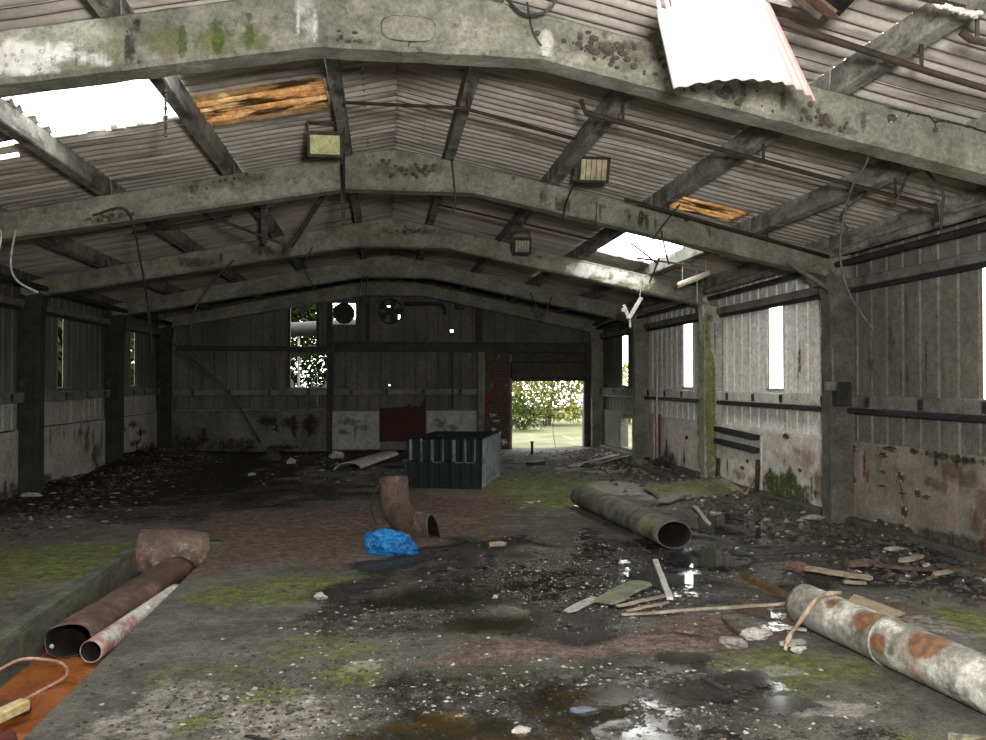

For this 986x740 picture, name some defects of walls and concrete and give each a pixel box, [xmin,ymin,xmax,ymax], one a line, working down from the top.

spalling [561,30,744,107]
spalling [800,101,849,133]
damp [171,414,319,452]